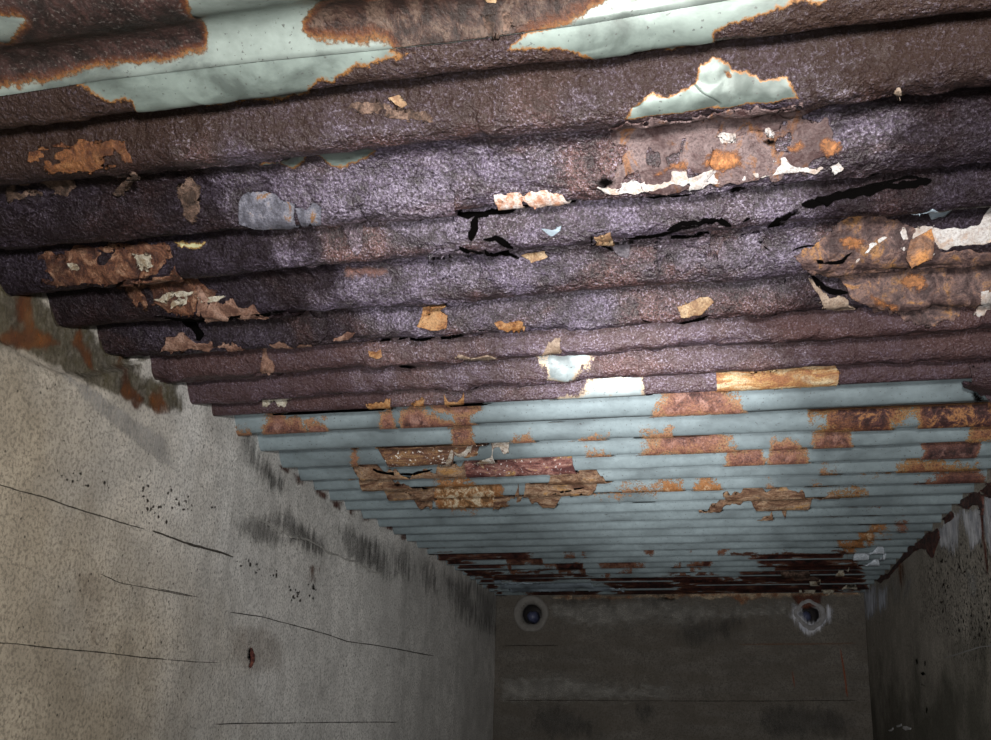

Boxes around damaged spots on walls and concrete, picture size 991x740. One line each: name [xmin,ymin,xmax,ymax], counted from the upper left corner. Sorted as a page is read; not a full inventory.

rust [0,0,208,90]
rust [302,0,605,48]
peeling [597,169,720,195]
peeling [733,157,844,182]
peeling [856,208,991,263]
peeling [153,291,226,309]
rust [808,278,856,312]
crack [0,485,233,557]
rust [427,391,991,608]
efflorescence [940,497,991,553]
crack [0,642,219,663]
crack [231,612,433,656]